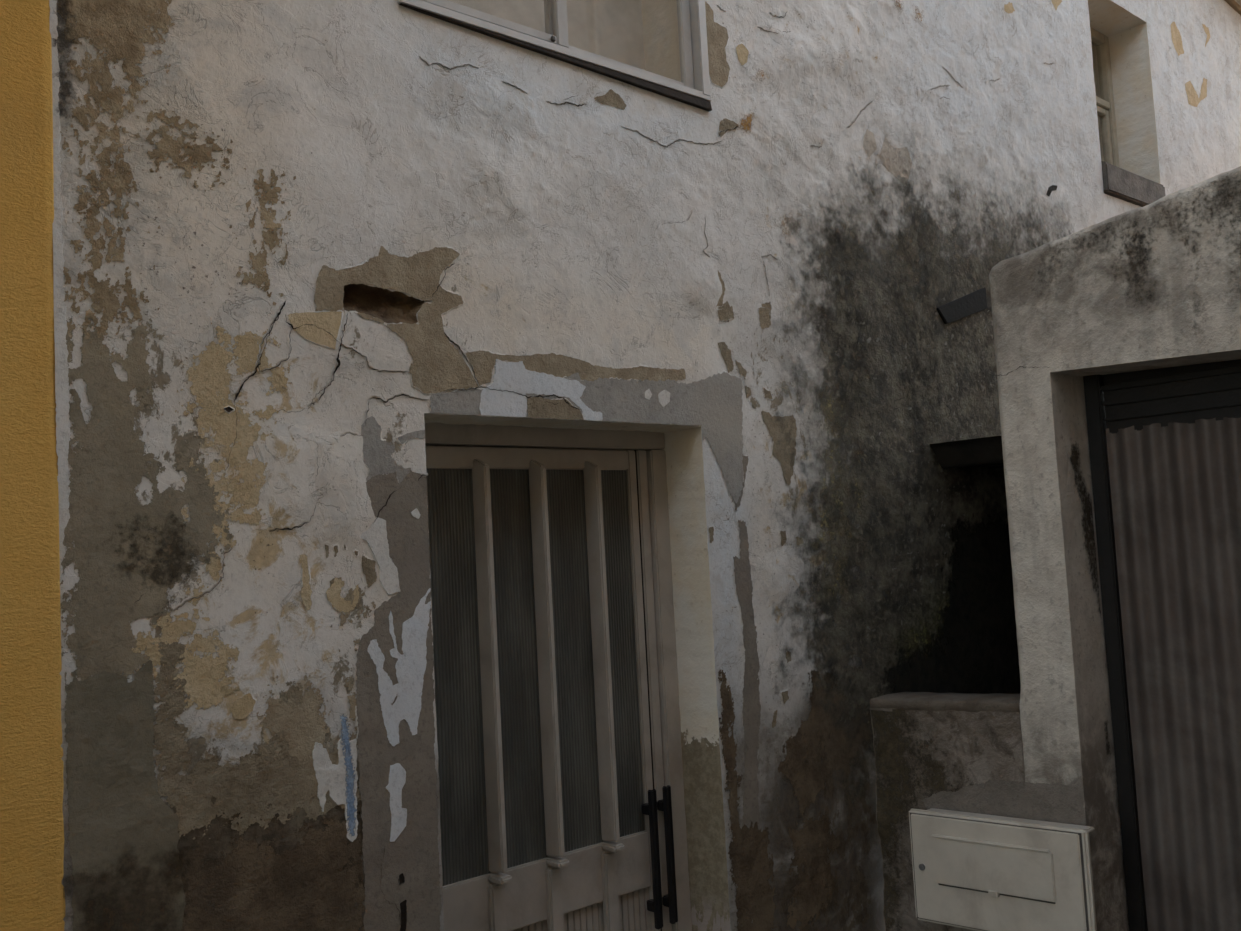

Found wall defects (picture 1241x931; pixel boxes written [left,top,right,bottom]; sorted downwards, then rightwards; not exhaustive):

crack [419,55,587,107]
crack [621,125,739,147]
peeling [705,1,749,89]
peeling [49,0,361,842]
crack [225,299,580,471]
flaking render [288,246,686,421]
peeling [718,342,797,485]
damp [1121,234,1152,303]
crack [269,459,323,532]
damp [784,175,1048,931]
peeling [353,588,431,746]
damp [63,808,365,931]